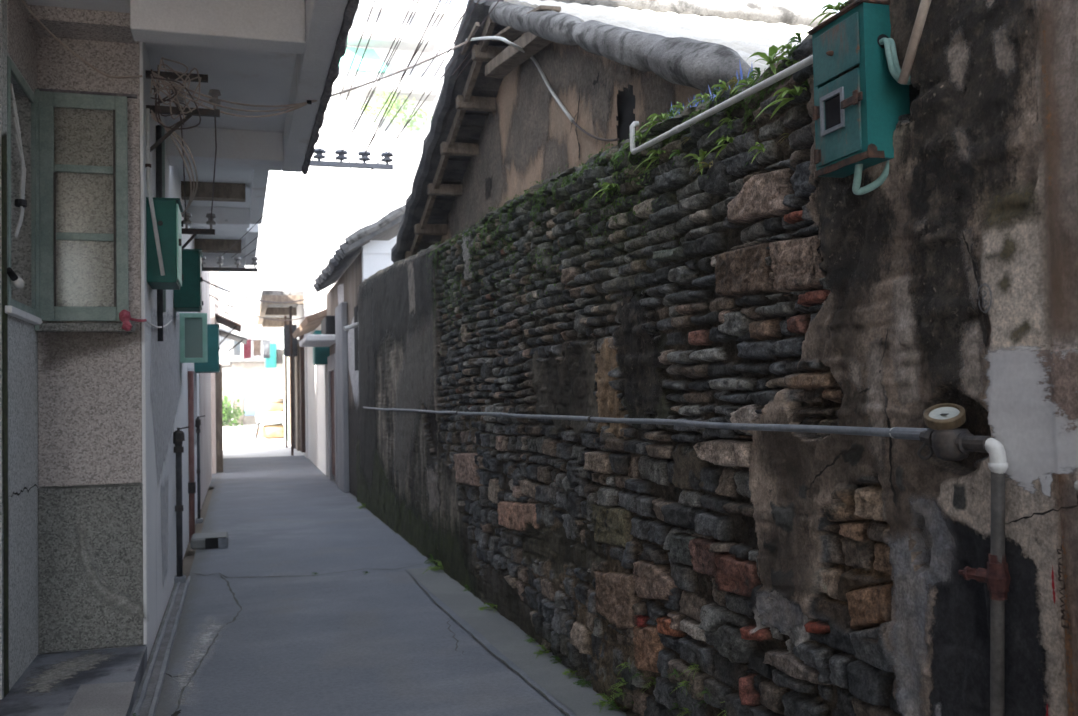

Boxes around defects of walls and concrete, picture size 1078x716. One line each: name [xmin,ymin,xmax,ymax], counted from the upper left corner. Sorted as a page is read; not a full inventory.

water stain [809,0,1041,429]
flaking render [781,360,844,442]
peeling [805,272,1078,639]
crack [1005,494,1078,524]
crack [166,569,360,716]
crack [391,563,570,716]
water stain [887,498,991,716]
water stain [1005,535,1050,716]